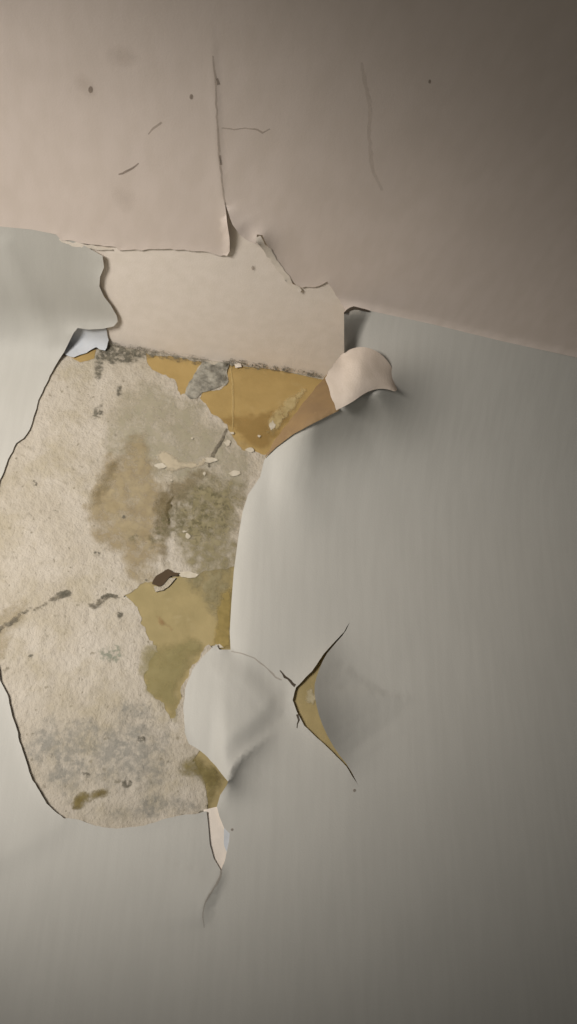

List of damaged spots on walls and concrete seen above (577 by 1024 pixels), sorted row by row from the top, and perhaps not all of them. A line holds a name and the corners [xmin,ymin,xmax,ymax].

mould [95,341,204,379]
mould [230,360,320,377]
water stain [91,388,245,613]
flaking render [0,204,577,829]